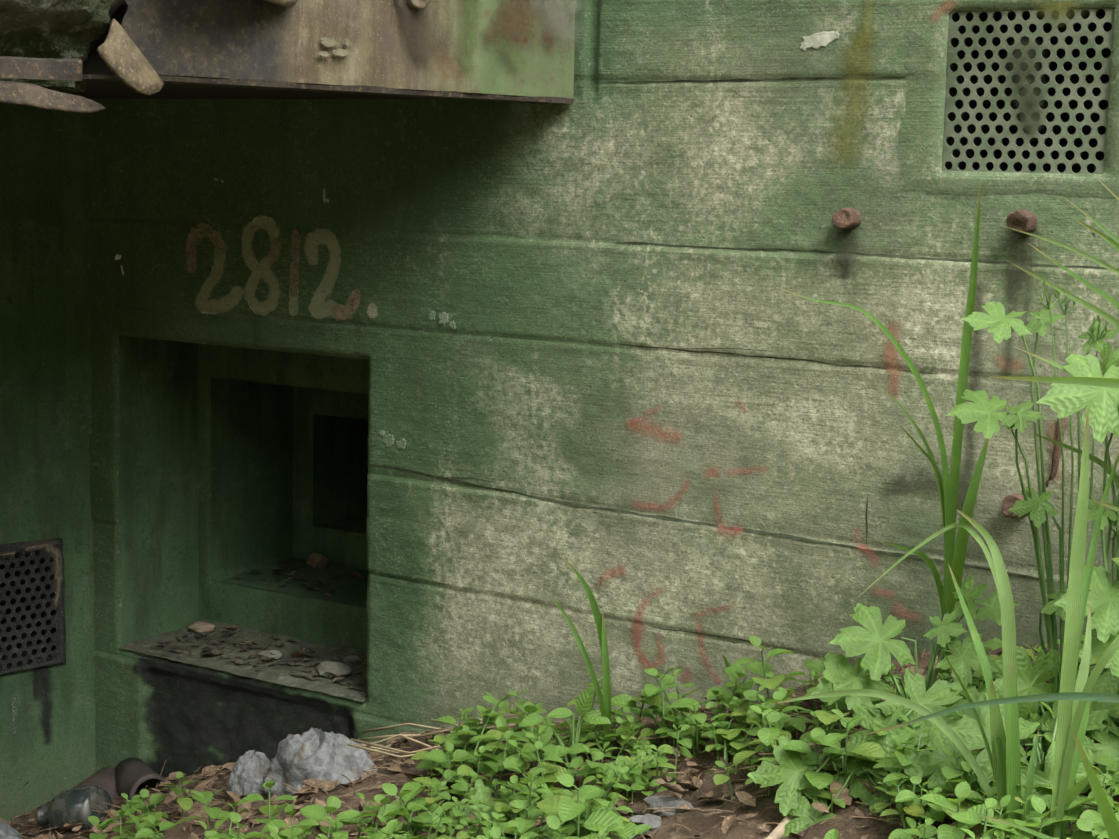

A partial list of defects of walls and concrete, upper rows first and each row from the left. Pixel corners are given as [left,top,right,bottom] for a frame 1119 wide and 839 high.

peeling [800,31,840,51]
damp [34,657,52,743]
damp [336,706,353,739]